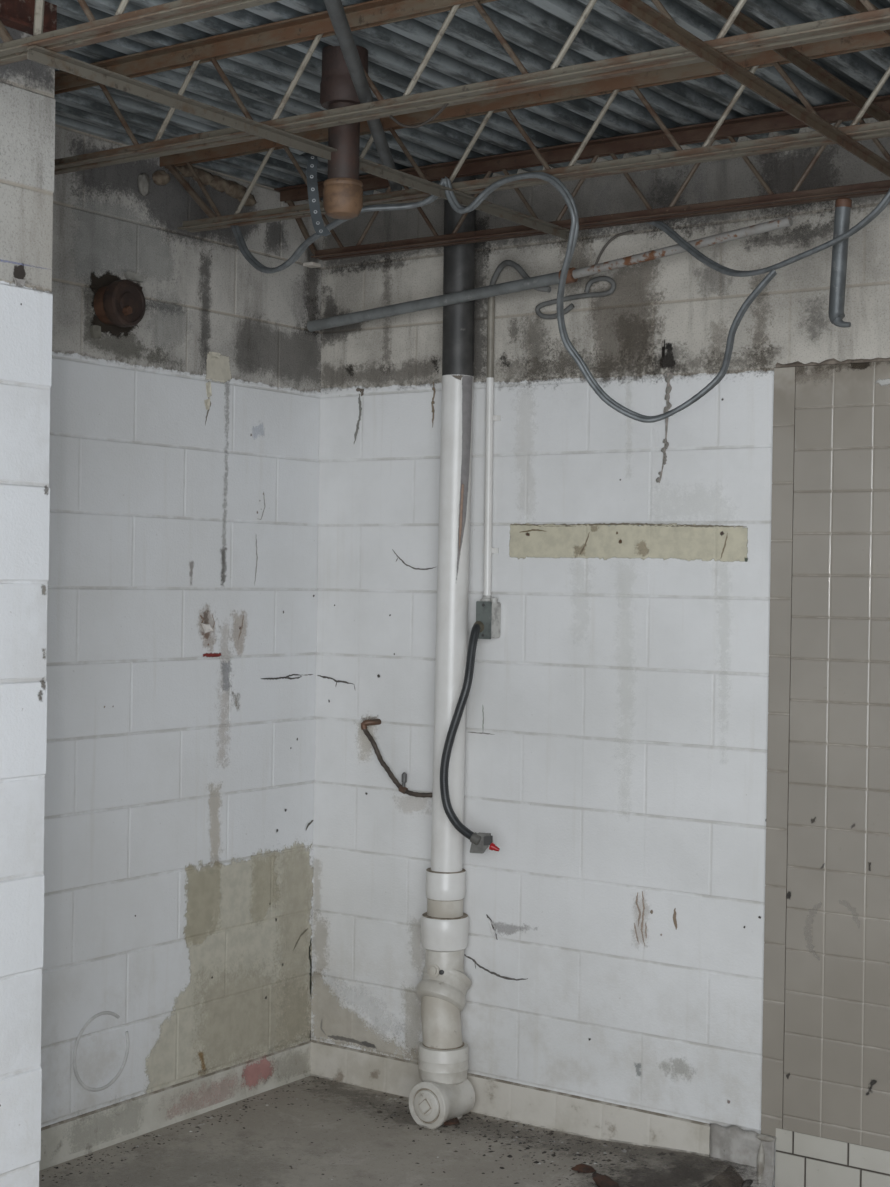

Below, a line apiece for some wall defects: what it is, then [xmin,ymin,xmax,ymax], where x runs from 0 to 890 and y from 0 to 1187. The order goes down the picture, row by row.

damp [77,160,257,248]
damp [321,286,361,345]